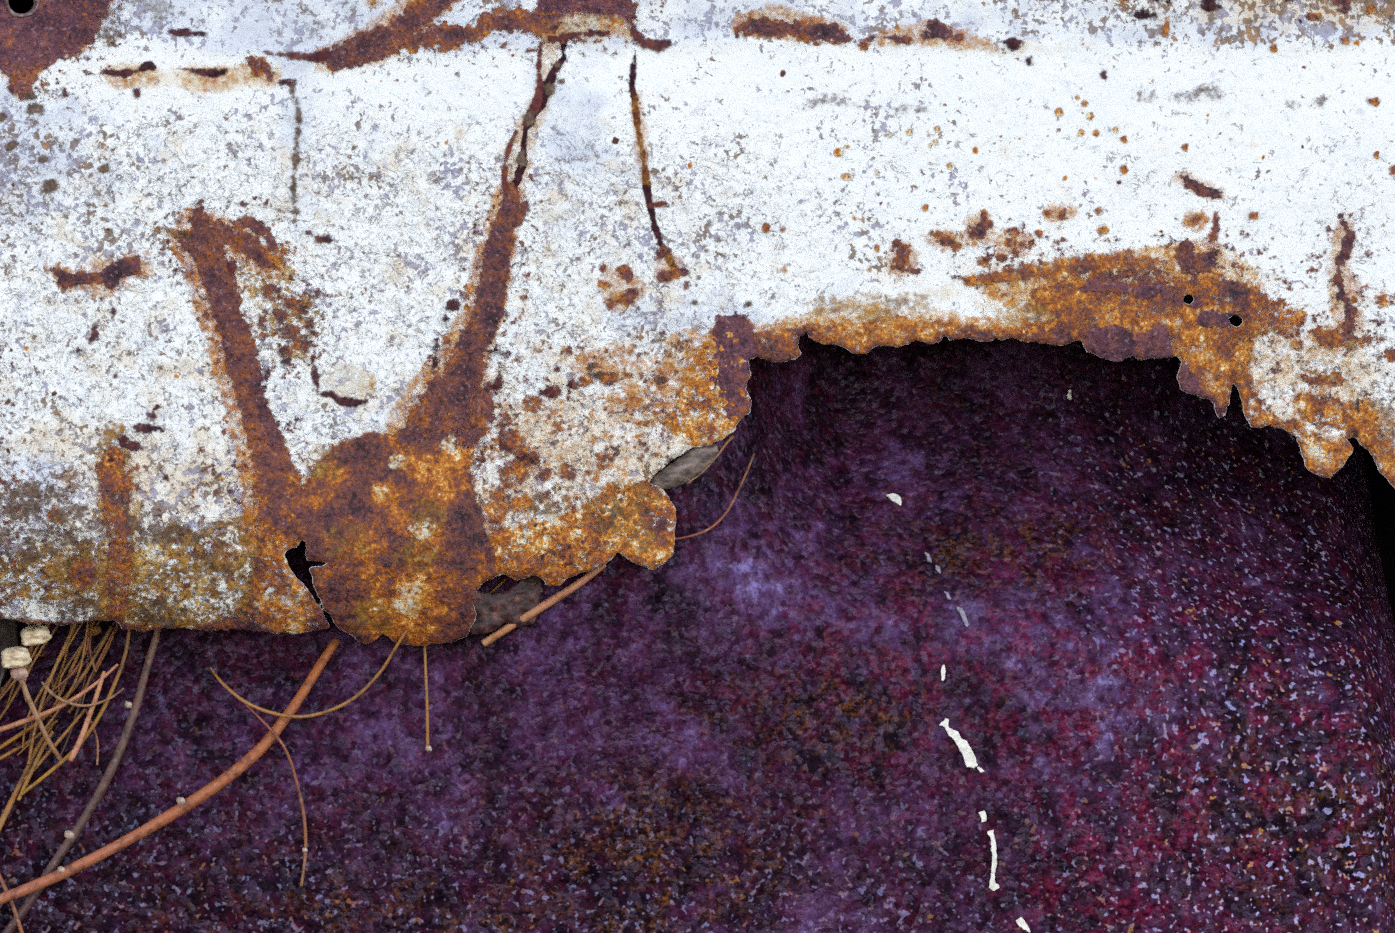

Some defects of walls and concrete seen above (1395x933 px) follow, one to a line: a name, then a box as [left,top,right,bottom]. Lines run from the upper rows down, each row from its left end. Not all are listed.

rust [0,0,186,103]
rust [264,0,672,74]
rust [807,93,869,109]
rust [887,104,927,138]
rust [1075,95,1127,143]
rust [1137,79,1226,102]
crack [629,50,689,290]
rust [47,165,1395,646]
rust [0,345,21,615]